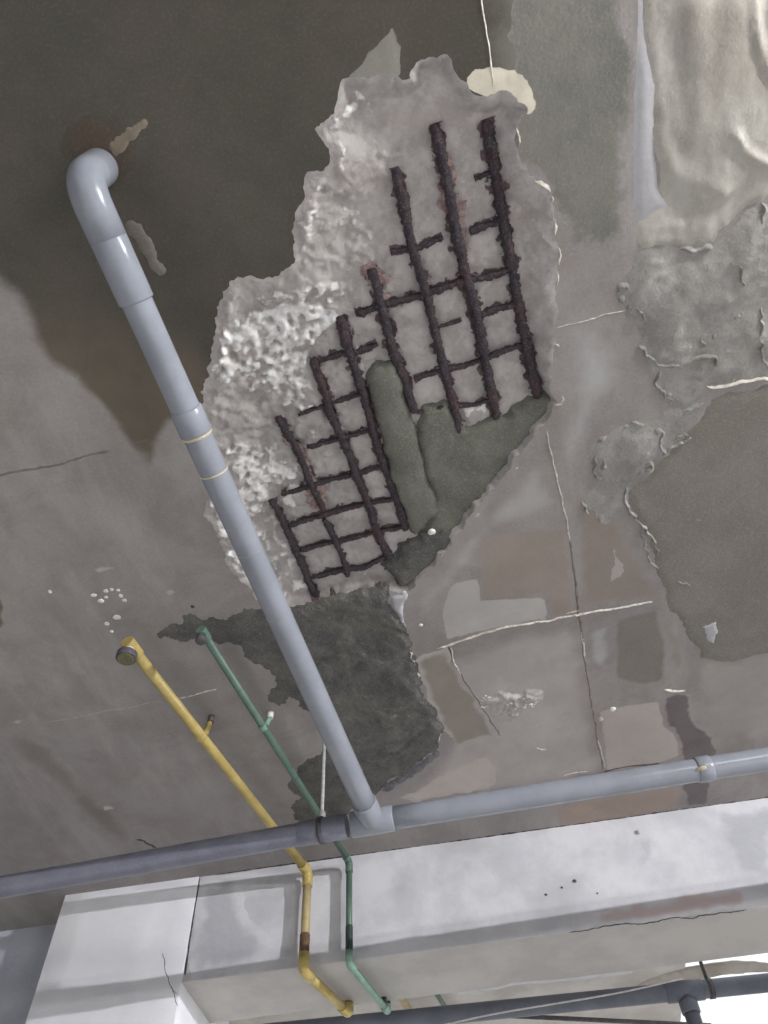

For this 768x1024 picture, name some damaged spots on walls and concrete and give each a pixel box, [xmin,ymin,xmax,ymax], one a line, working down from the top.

rust [283,439,331,510]
water stain [0,0,637,477]
spalling [201,28,560,627]
rust [437,154,470,250]
crack [410,432,659,776]
water stain [405,306,720,802]
flaking render [582,202,768,524]
crack [162,796,768,1006]